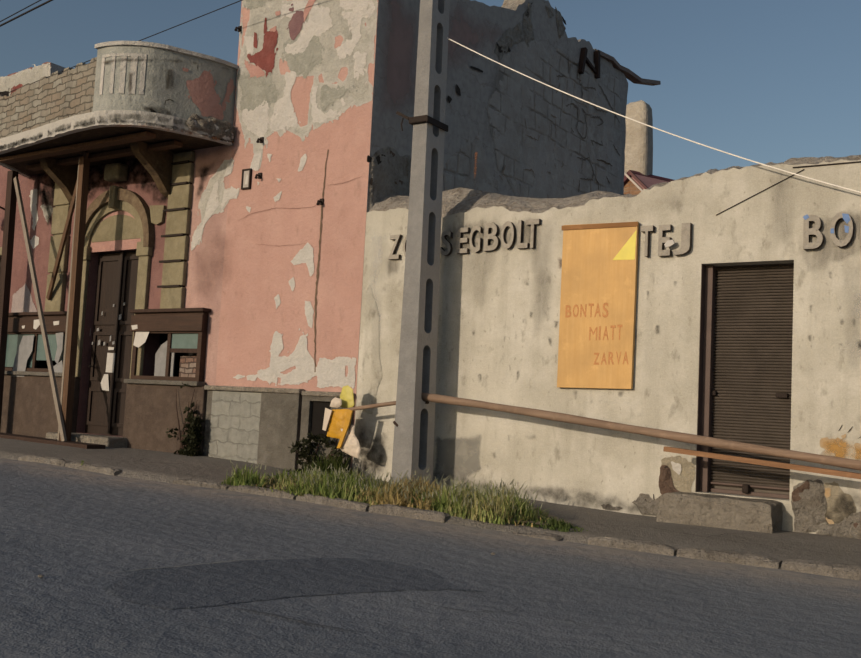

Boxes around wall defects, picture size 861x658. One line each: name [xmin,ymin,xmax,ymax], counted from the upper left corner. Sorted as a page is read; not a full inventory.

peeling [0,63,51,96]
peeling [183,0,378,171]
flaking render [443,2,623,198]
peeling [191,158,240,251]
flaking render [367,146,411,211]
peeling [291,243,314,276]
peeling [233,301,356,388]
flaking render [791,479,861,539]